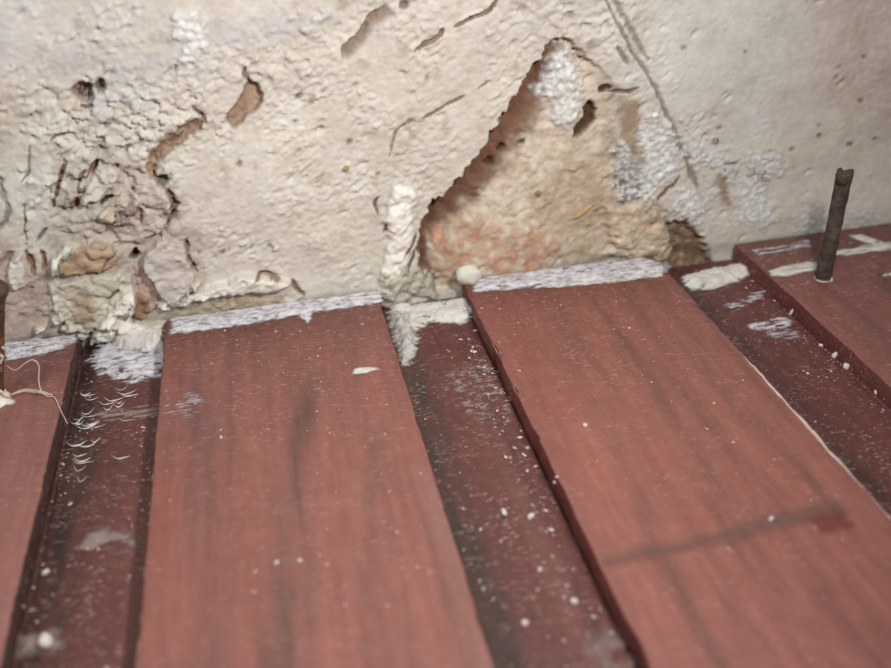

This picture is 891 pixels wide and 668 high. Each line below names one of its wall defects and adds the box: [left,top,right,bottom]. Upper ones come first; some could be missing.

spalling [227,66,262,127]
flaking render [416,37,711,293]
leakage [610,110,788,232]
peeling [8,258,25,291]
peeling [37,151,199,346]